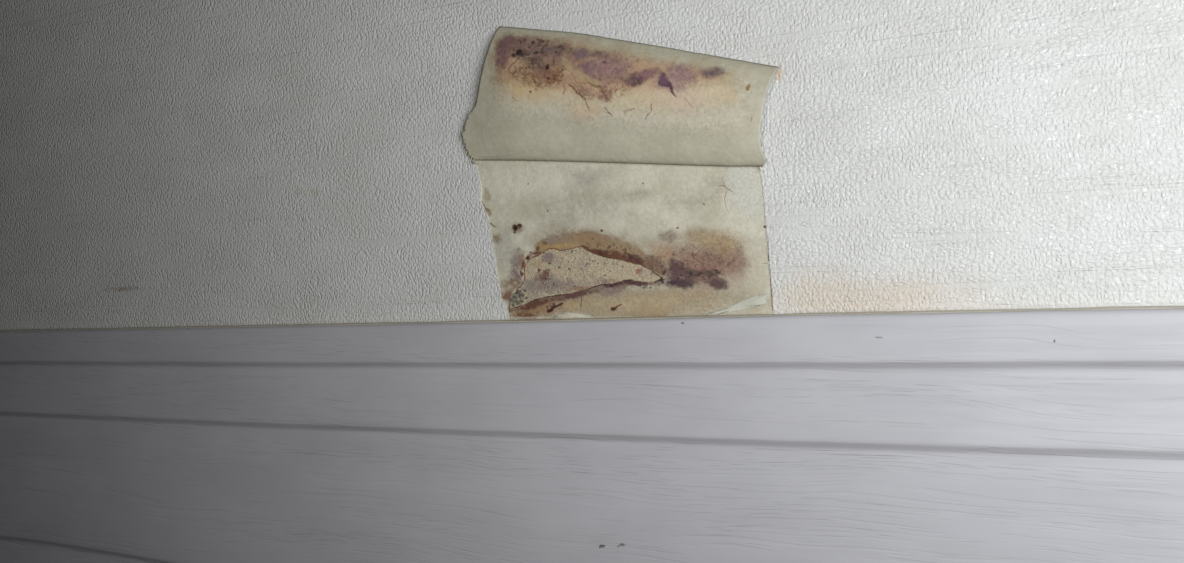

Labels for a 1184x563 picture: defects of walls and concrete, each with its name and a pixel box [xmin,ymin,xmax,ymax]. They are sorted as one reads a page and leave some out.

water stain [492,36,754,131]
peeling [475,160,773,324]
water stain [502,227,746,317]